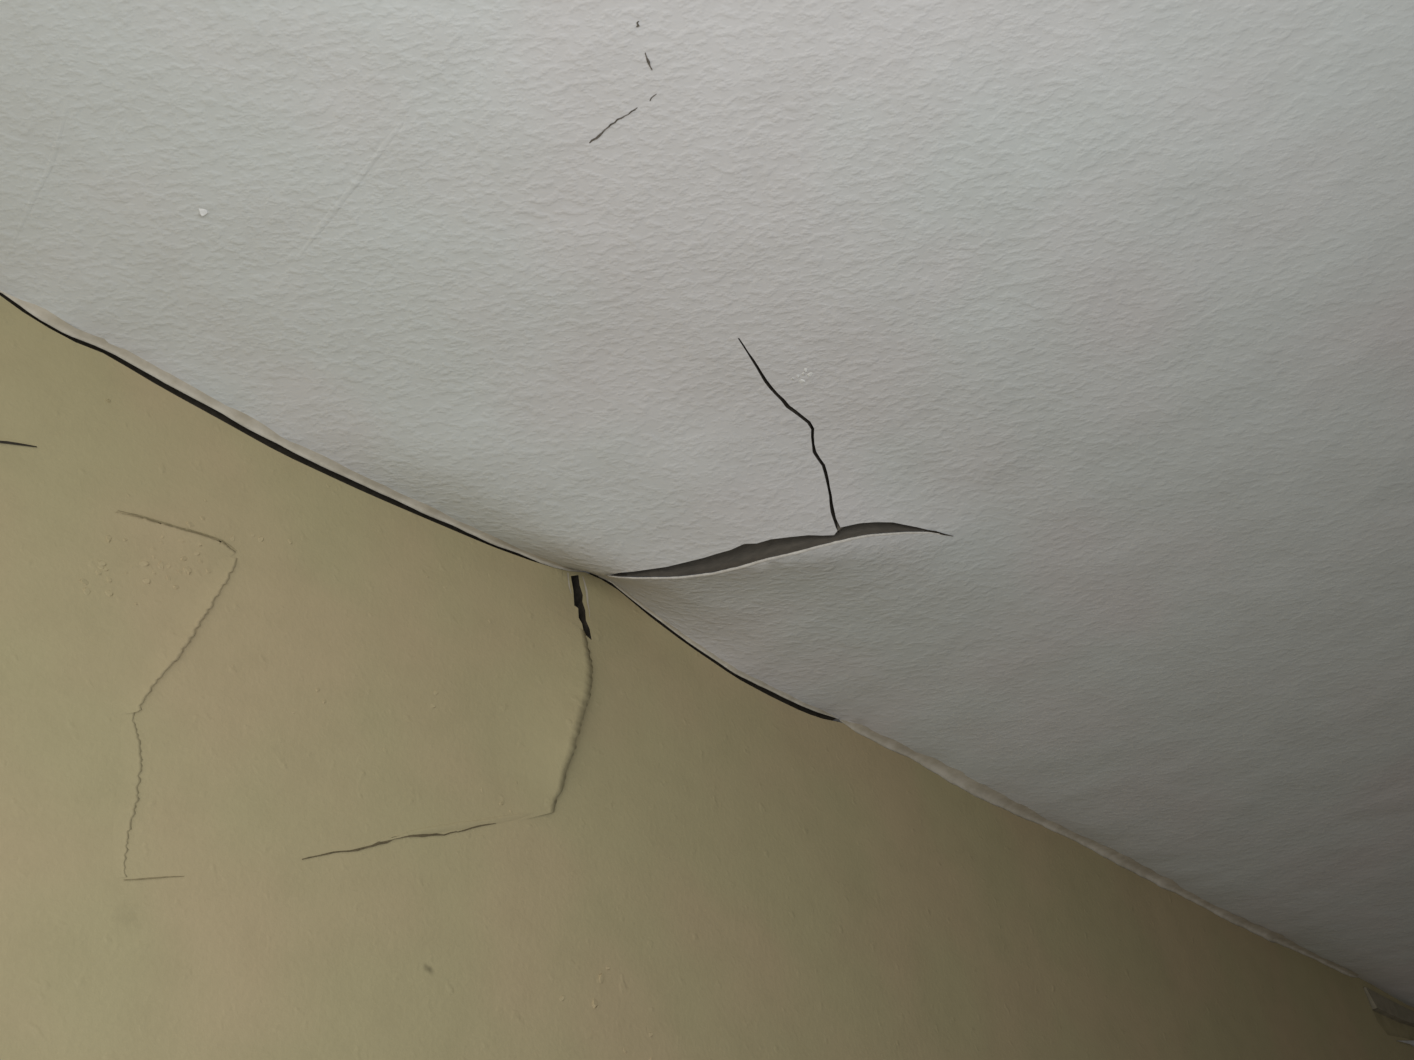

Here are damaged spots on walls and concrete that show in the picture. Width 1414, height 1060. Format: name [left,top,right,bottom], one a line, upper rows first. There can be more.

crack [0,293,839,722]
peeling [495,603,593,821]